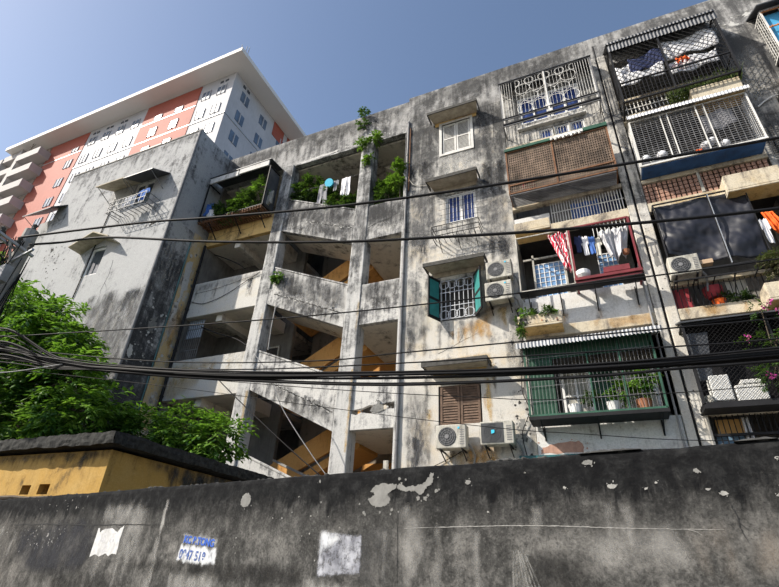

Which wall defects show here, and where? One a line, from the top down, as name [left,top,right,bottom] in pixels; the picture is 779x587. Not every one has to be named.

damp [84,290,144,364]
flaking render [512,388,595,467]
peeling [241,493,252,507]
peeling [359,473,440,516]
damp [17,521,91,587]